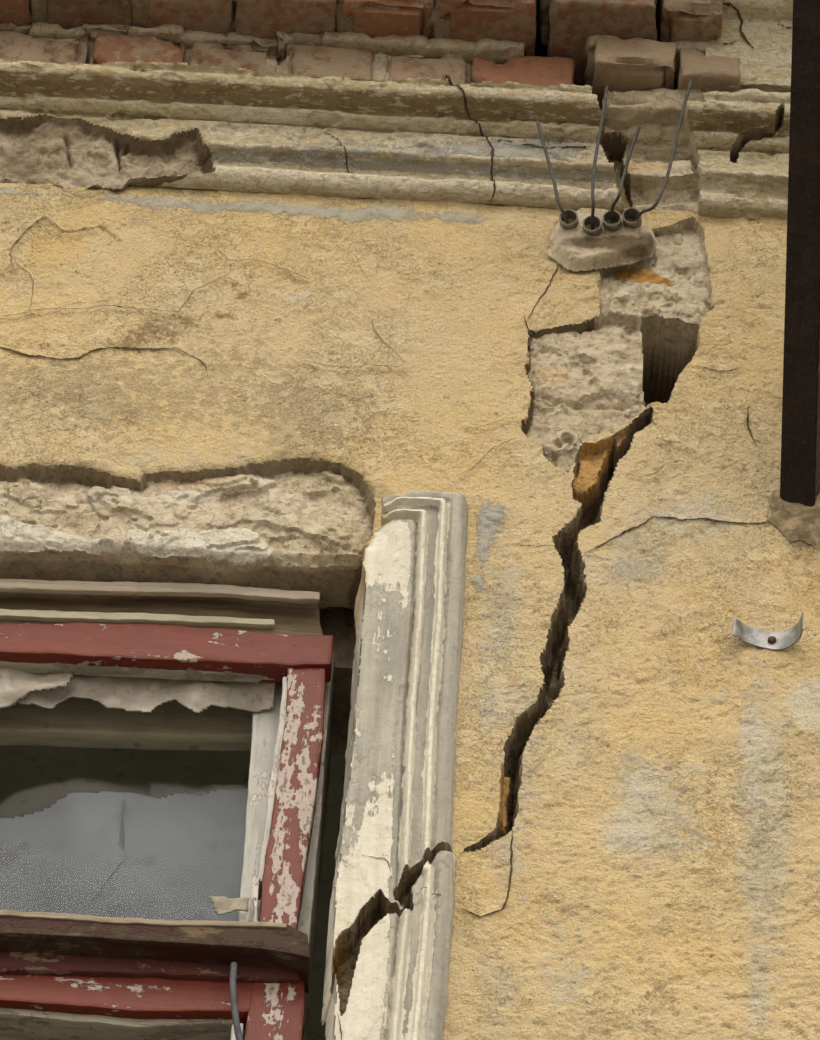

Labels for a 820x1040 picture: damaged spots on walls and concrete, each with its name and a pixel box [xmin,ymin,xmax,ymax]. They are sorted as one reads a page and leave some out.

spalling [0,114,216,200]
crack [443,75,592,201]
crack [0,347,208,376]
spalling [459,107,715,475]
spalling [0,457,376,609]
crack [329,405,770,1040]